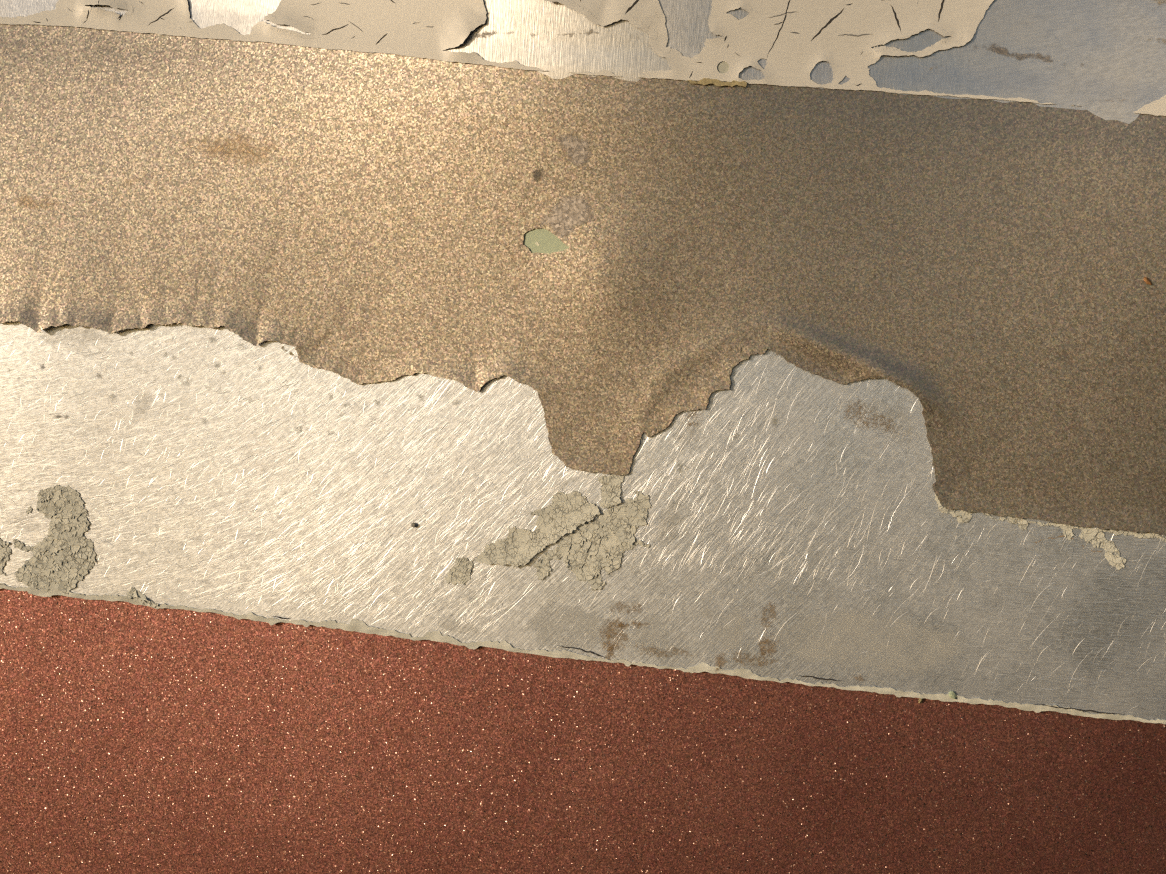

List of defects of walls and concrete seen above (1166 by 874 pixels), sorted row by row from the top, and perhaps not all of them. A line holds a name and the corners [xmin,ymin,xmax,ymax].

peeling [0,0,134,18]
peeling [181,0,319,39]
peeling [443,0,723,82]
peeling [727,7,749,20]
crack [724,0,869,57]
peeling [717,58,767,80]
peeling [810,61,850,89]
peeling [860,0,1166,124]
peeling [0,305,1166,720]